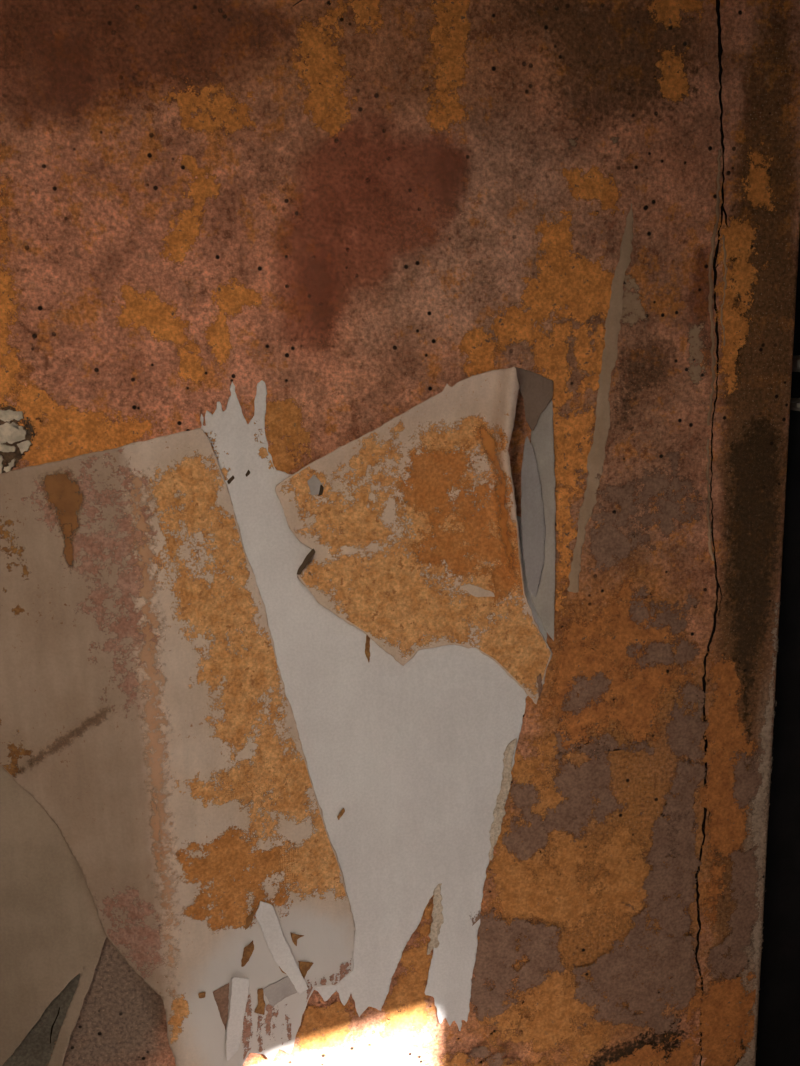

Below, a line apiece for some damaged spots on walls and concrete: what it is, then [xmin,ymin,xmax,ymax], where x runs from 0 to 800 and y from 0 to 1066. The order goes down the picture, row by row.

leakage [281,126,463,337]
flaking render [0,403,37,473]
corrosion [42,471,84,568]
crack [695,0,728,1066]
peeling [626,582,700,675]
corrosion [127,475,178,977]
peeling [465,602,781,1066]
peeling [2,973,80,1066]
peeling [242,995,252,1059]
corrosion [241,941,254,967]
corrosion [254,988,265,1015]
corrosion [298,961,313,978]